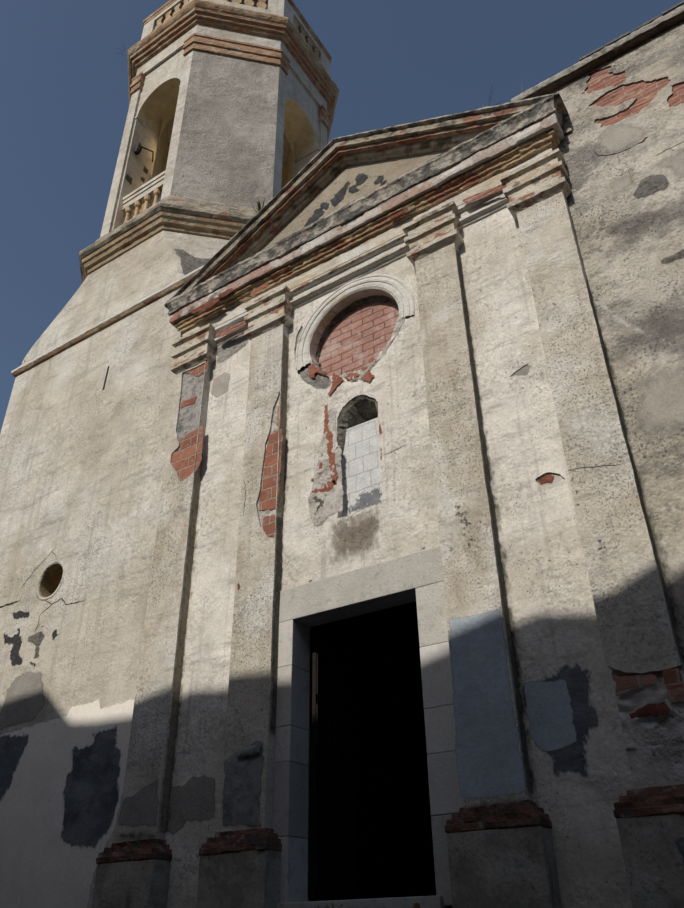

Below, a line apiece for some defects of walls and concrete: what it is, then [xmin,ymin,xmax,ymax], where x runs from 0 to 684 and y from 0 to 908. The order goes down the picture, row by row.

flaking render [582,67,684,126]
flaking render [304,173,386,226]
flaking render [171,321,248,481]
flaking render [298,295,406,526]
flaking render [257,395,283,540]
flaking render [536,473,565,487]
water stain [333,488,382,557]
crack [34,598,82,632]
spalling [611,667,684,789]